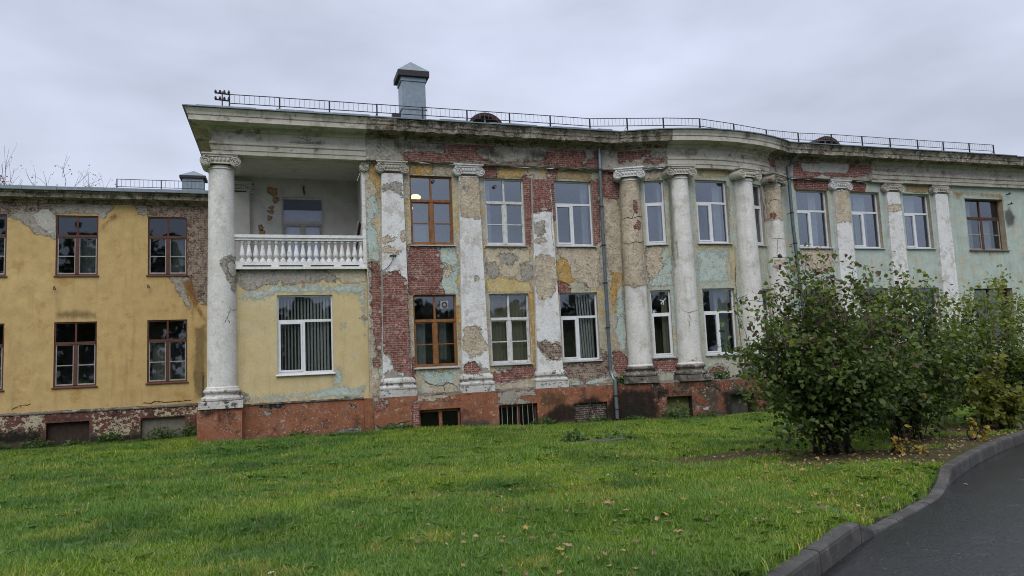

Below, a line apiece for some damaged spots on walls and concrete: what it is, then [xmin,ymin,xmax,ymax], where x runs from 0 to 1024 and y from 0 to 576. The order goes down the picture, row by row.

flaking render [793,161,901,223]
flaking render [0,203,114,240]
flaking render [135,142,674,436]
peeling [0,414,45,435]
peeling [92,406,198,436]